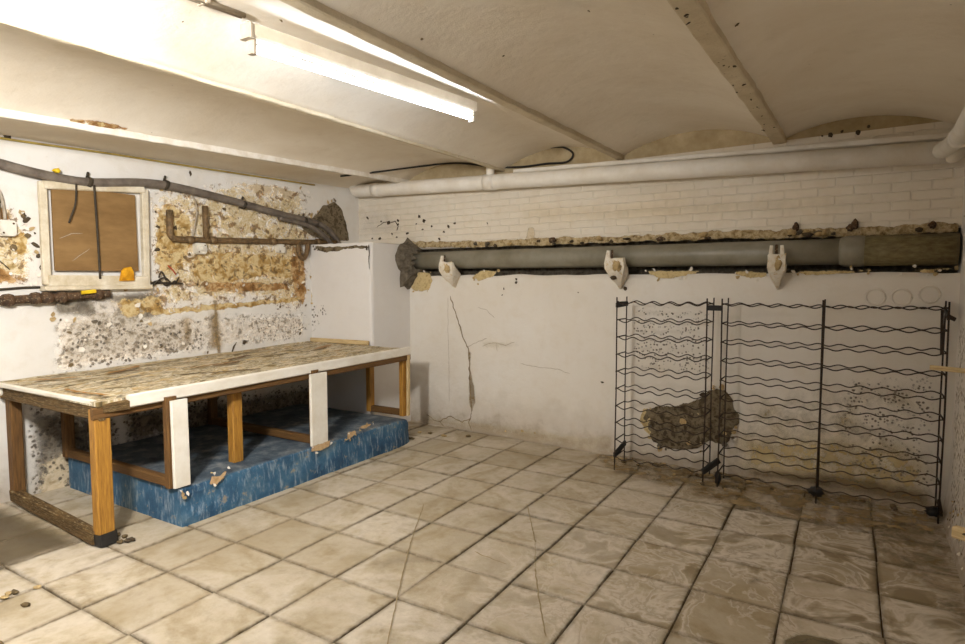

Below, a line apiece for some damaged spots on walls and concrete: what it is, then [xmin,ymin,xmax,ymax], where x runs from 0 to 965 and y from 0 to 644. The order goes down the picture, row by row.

peeling [0,201,41,286]
peeling [50,180,959,327]
crack [428,296,570,429]
spalling [210,467,230,487]
spalling [311,440,332,454]
leakage [756,383,930,503]
leakage [785,635,839,644]